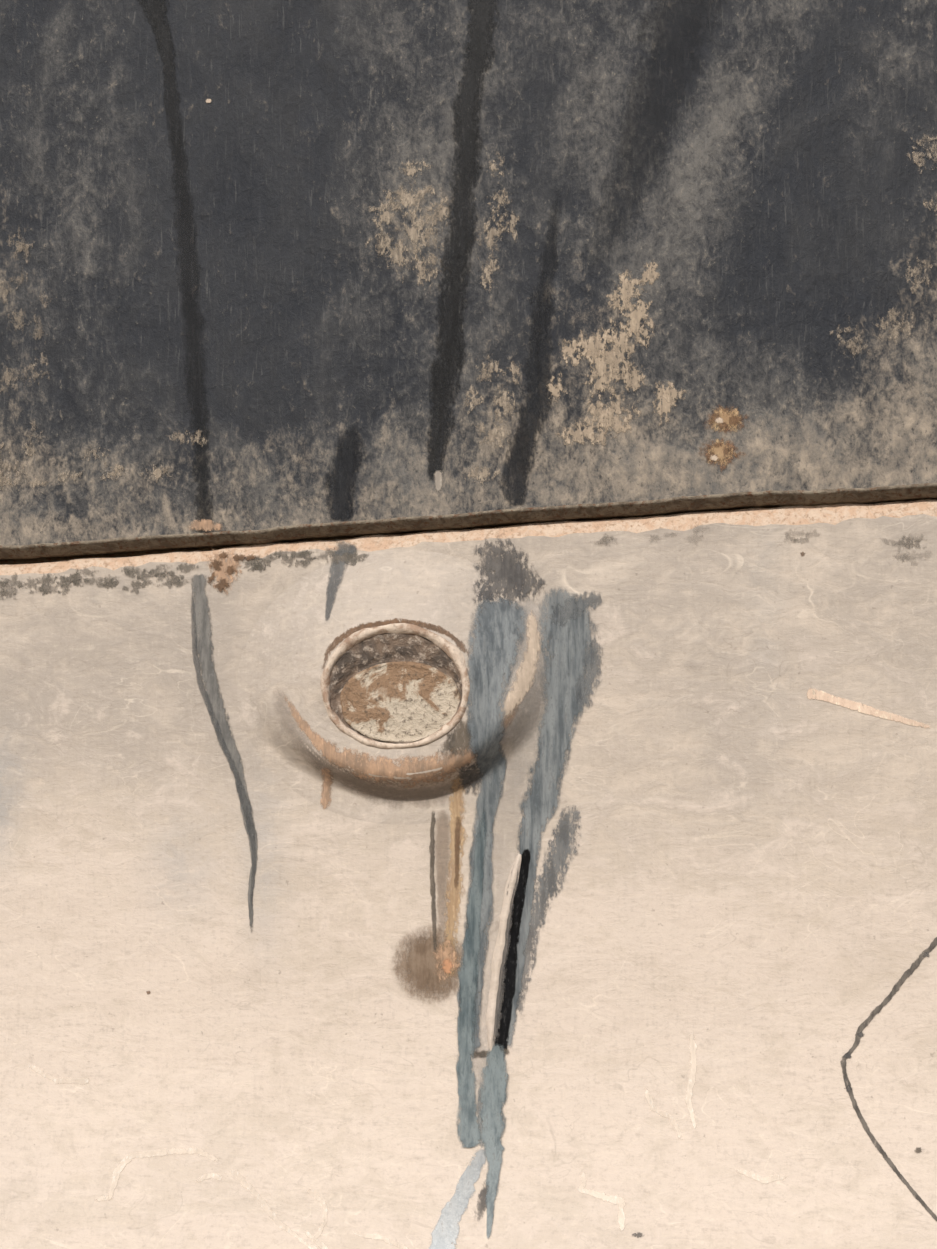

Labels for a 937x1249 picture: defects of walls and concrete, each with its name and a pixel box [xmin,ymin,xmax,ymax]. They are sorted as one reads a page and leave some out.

water stain [139,0,193,239]
water stain [427,0,497,491]
water stain [191,574,257,926]
water stain [325,541,356,620]
water stain [326,427,362,521]
rust [292,709,475,998]
rust [324,618,468,664]
crack [486,849,530,1057]
water stain [429,540,602,1249]
water stain [502,252,557,506]
rust [704,407,747,470]
crack [841,937,937,1221]